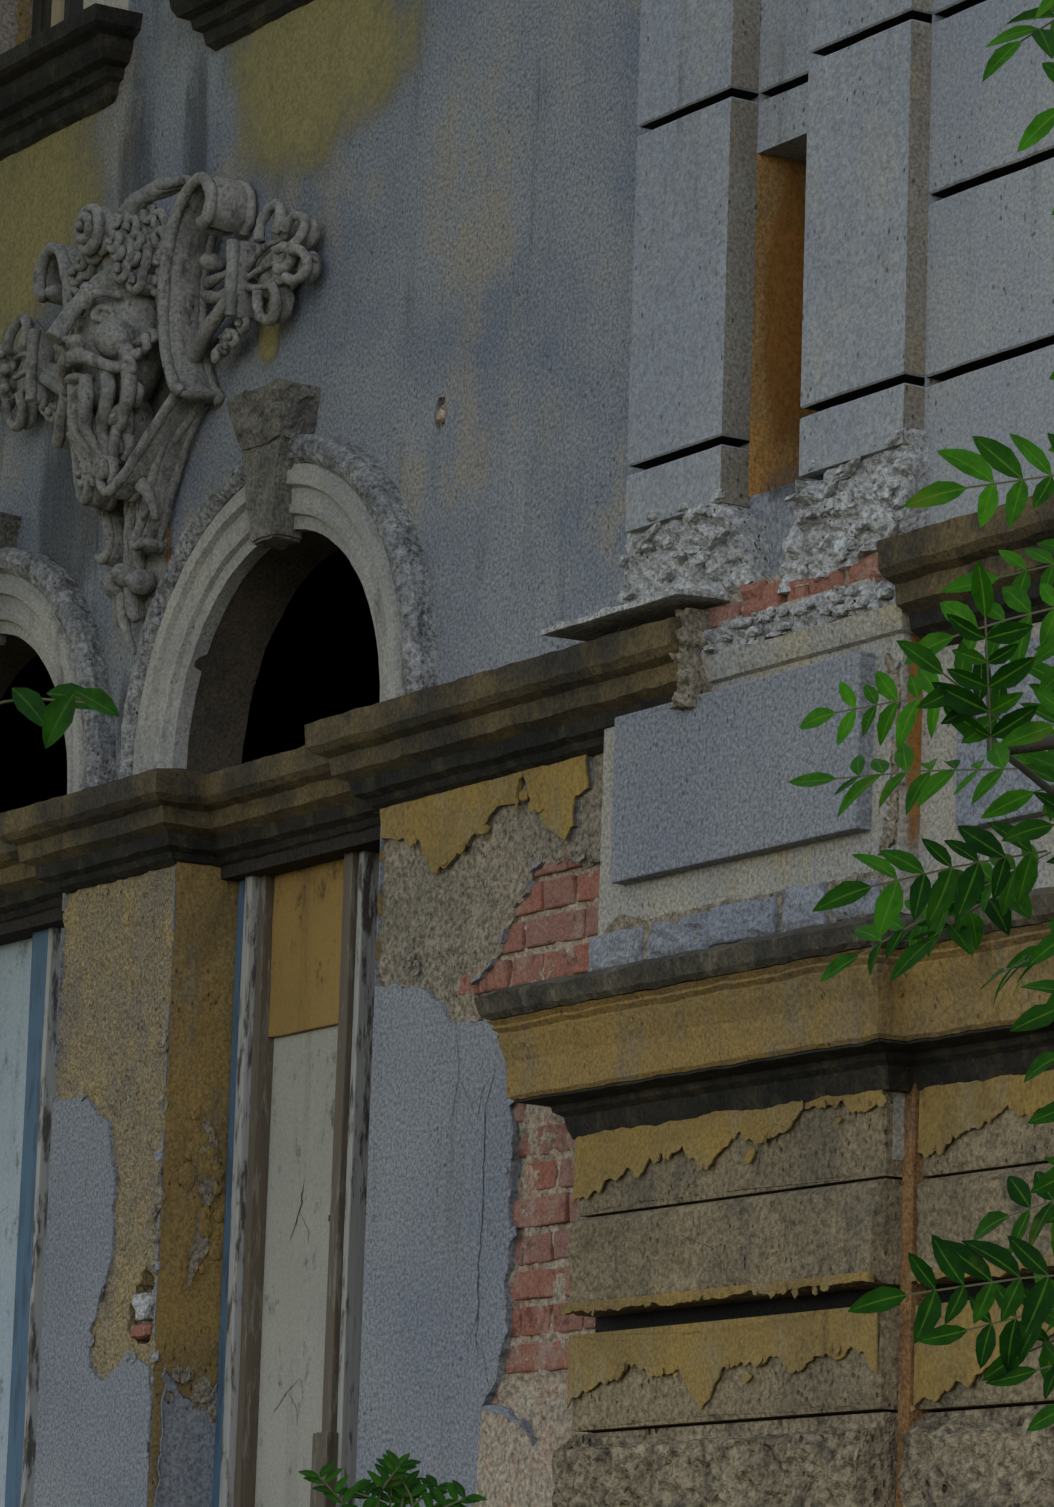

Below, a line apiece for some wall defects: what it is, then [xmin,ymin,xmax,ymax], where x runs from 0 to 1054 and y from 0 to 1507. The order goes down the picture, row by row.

flaking render [616,427,930,659]
flaking render [378,653,906,1023]
flaking render [50,865,224,1507]
flaking render [492,1084,887,1441]
flaking render [910,1299,1024,1412]
flaking render [909,1260,1027,1284]
flaking render [918,1070,1054,1158]